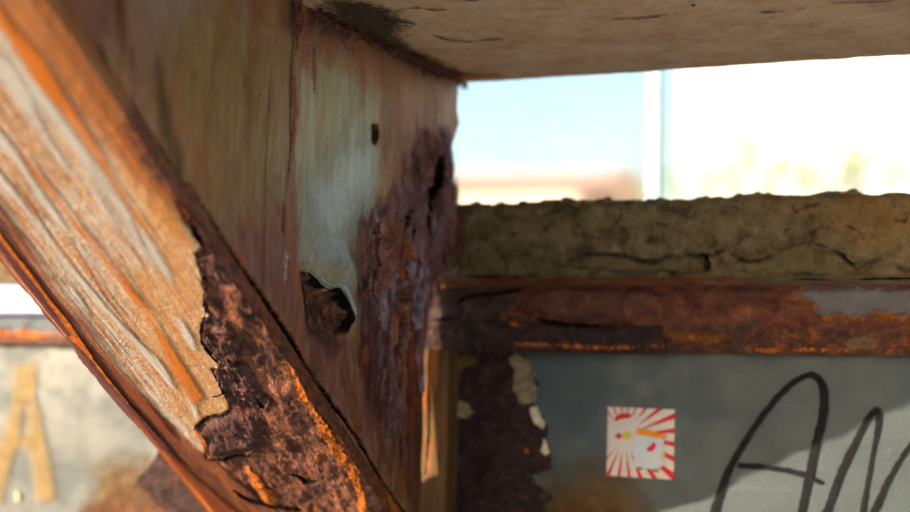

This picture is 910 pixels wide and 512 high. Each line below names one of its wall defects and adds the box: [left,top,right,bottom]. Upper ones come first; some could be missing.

corrosion [288,0,501,175]
corrosion [2,121,202,404]
corrosion [0,206,235,512]
corrosion [194,404,267,460]
corrosion [245,465,276,505]
peeling [177,198,386,512]
crack [184,185,404,512]
corrosion [283,359,371,512]
corrosion [313,120,467,500]